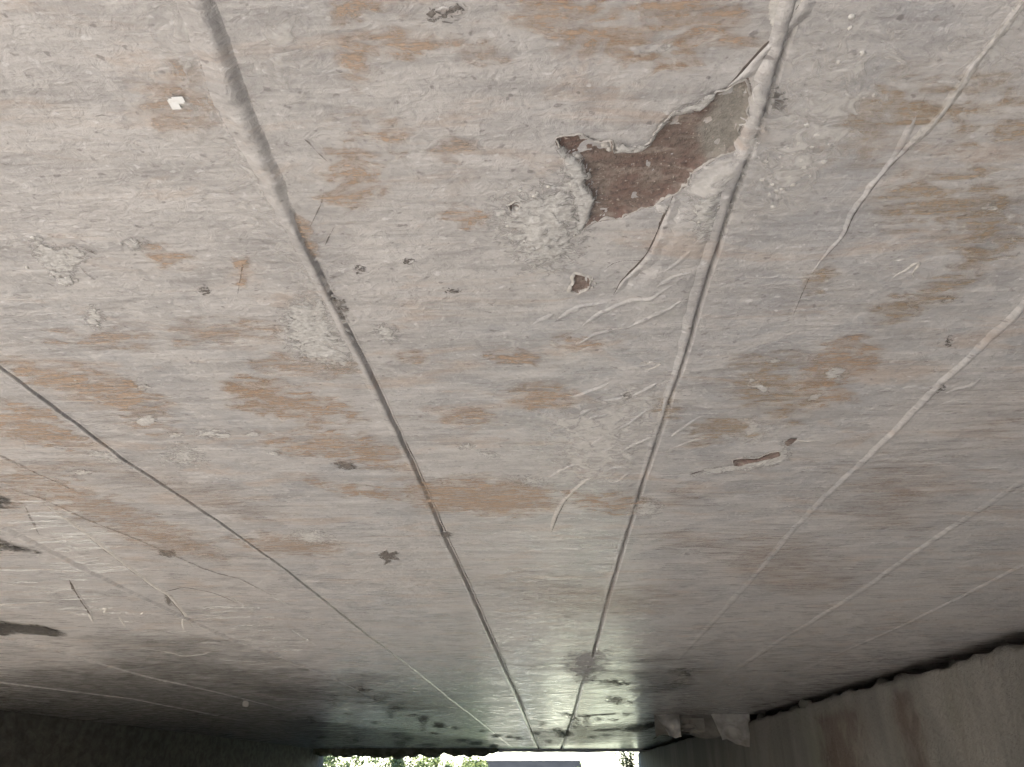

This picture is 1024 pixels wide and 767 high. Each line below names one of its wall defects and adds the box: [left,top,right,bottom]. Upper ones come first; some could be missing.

crack [613,195,681,296]
peeling [485,14,906,295]
crack [798,0,1024,303]
spalling [690,420,821,477]